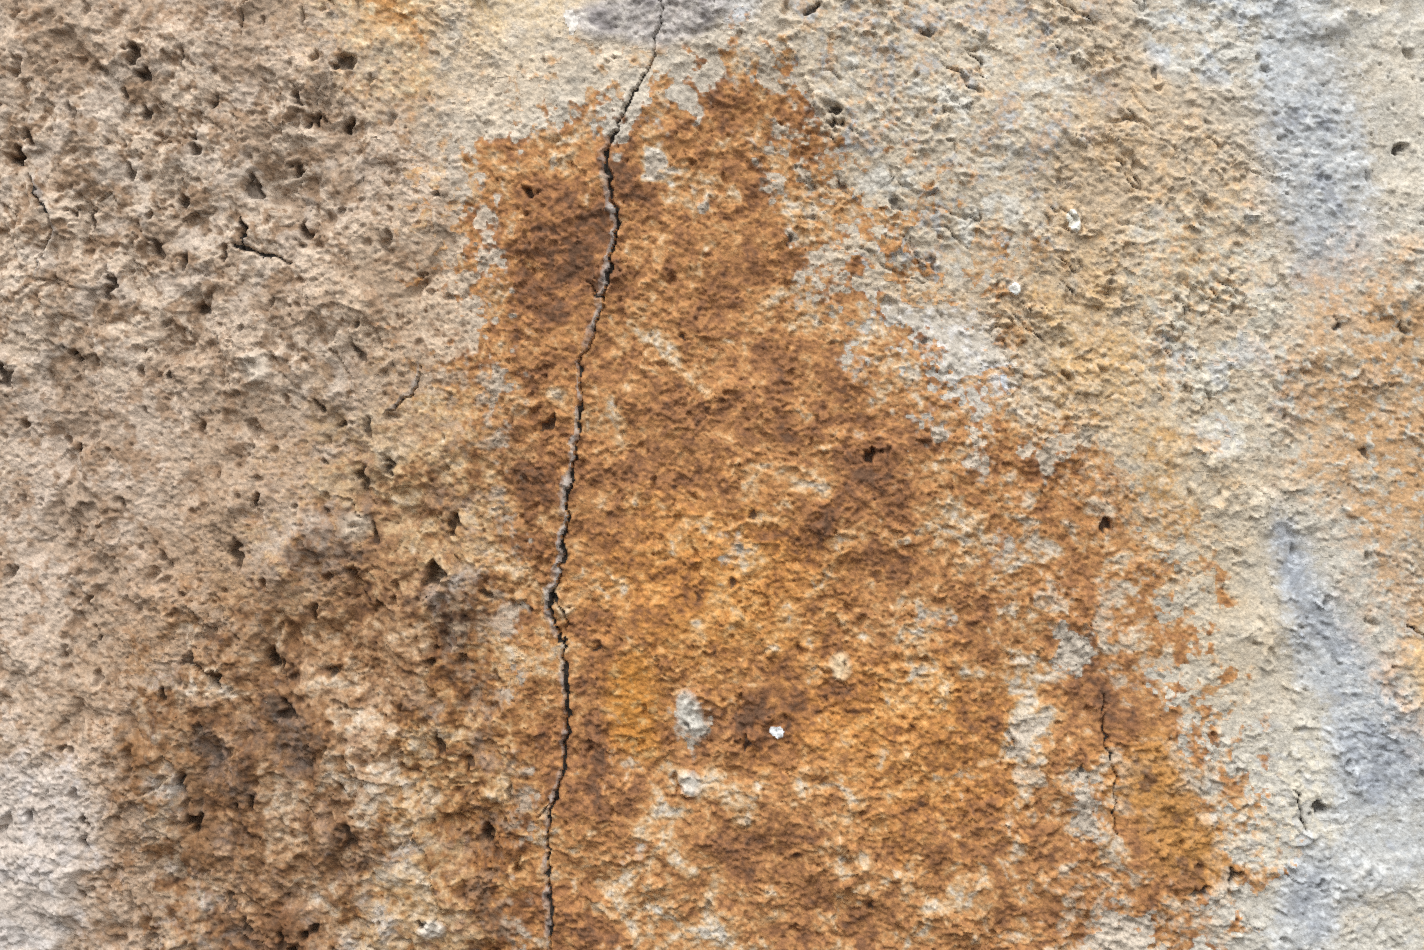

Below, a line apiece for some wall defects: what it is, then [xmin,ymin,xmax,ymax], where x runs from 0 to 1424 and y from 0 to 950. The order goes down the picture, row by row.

corrosion [682,47,709,71]
corrosion [872,135,927,166]
corrosion [392,196,438,238]
crack [540,15,662,950]
corrosion [1249,748,1279,774]